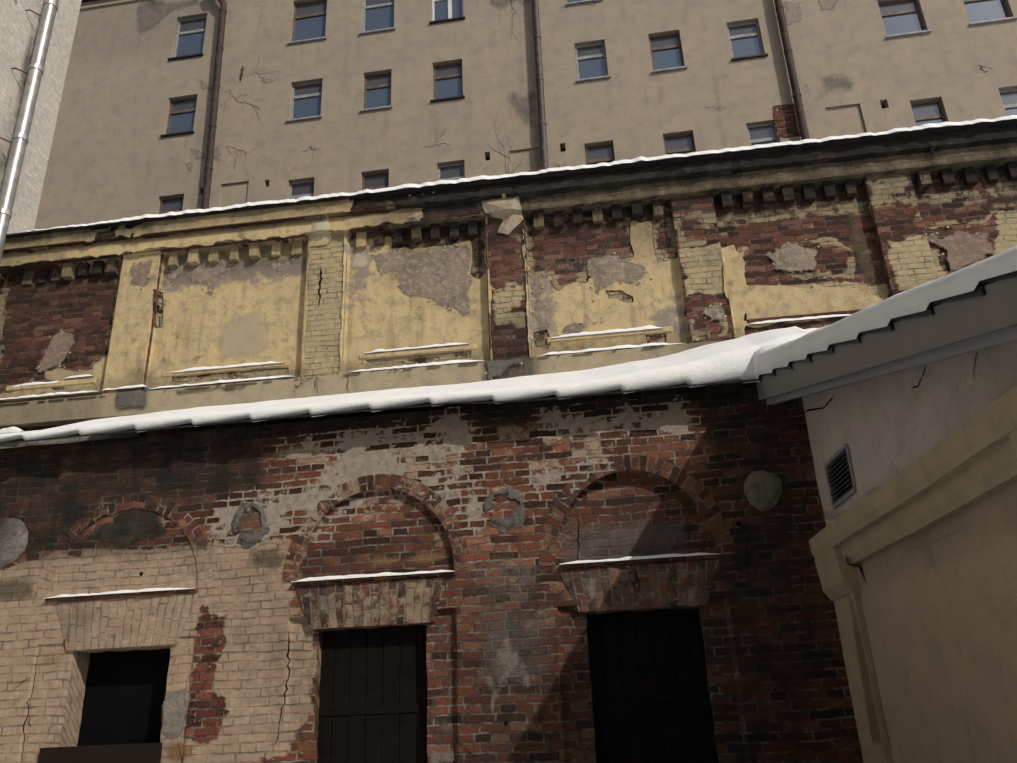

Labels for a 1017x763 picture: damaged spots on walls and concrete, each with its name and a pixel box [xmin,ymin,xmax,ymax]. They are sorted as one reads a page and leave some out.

flaking render [0,245,235,395]
crack [316,269,324,305]
peeling [345,188,487,316]
flaking render [524,214,653,348]
flaking render [652,206,710,262]
crack [786,395,835,451]
crack [16,655,38,761]
spalling [184,605,227,744]
crack [270,636,290,745]
spalling [299,739,318,763]